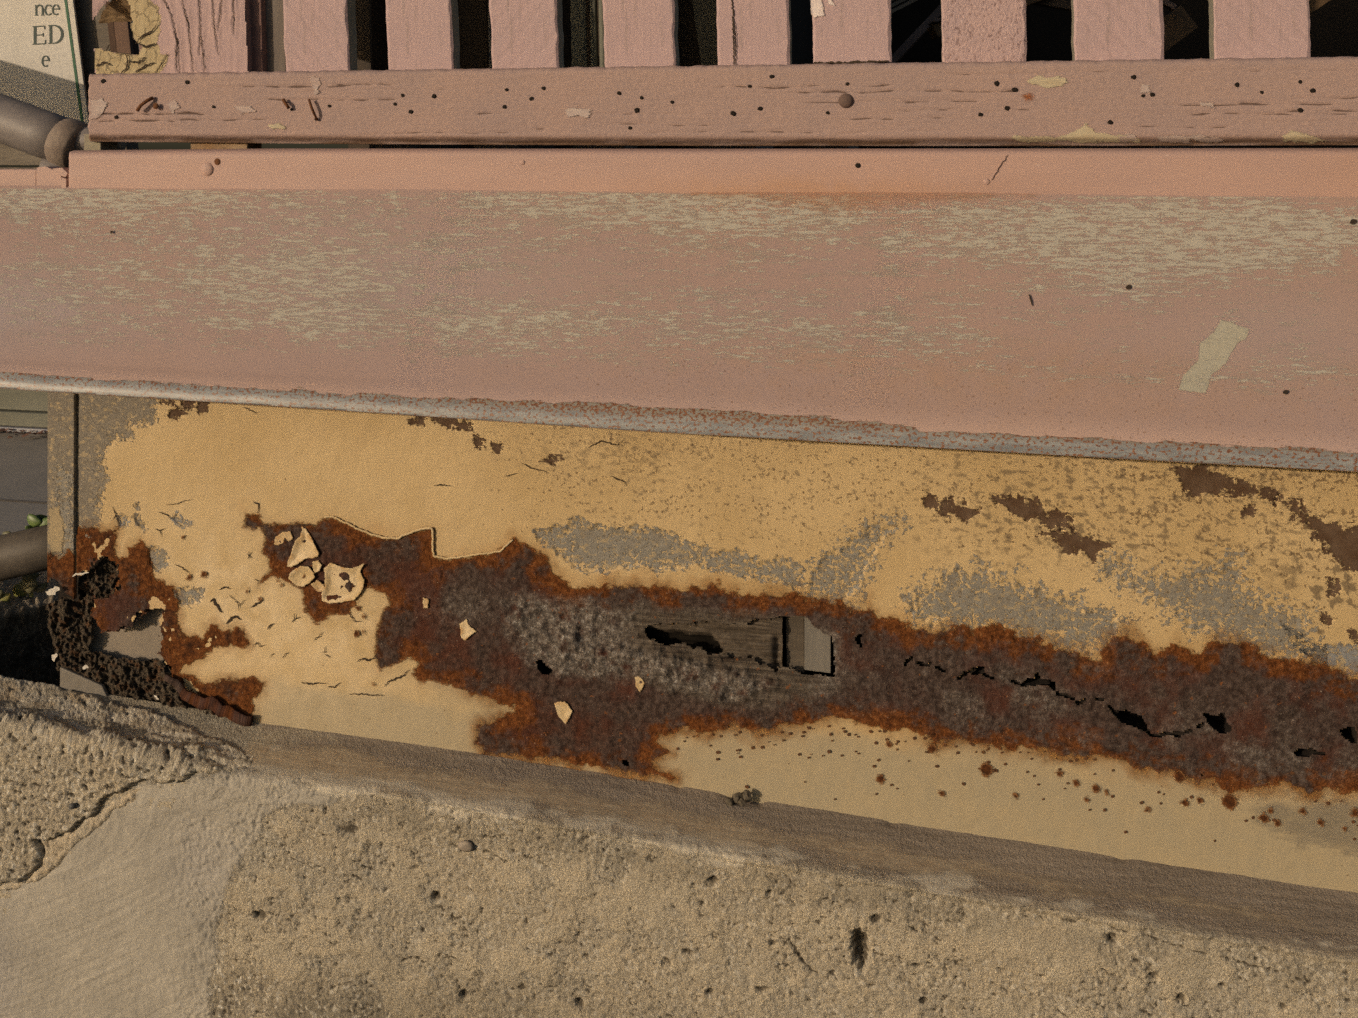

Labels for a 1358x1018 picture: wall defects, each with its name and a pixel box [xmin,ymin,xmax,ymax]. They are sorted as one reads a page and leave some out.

peeling [0,189,1358,401]
peeling [538,453,564,467]
corrosion [47,526,265,727]
peeling [173,585,205,609]
peeling [274,527,365,604]
peeling [459,619,477,640]
peeling [532,507,913,610]
peeling [895,463,1358,677]
corrosion [241,514,1358,832]
crack [905,657,1118,714]
crack [1146,722,1208,737]